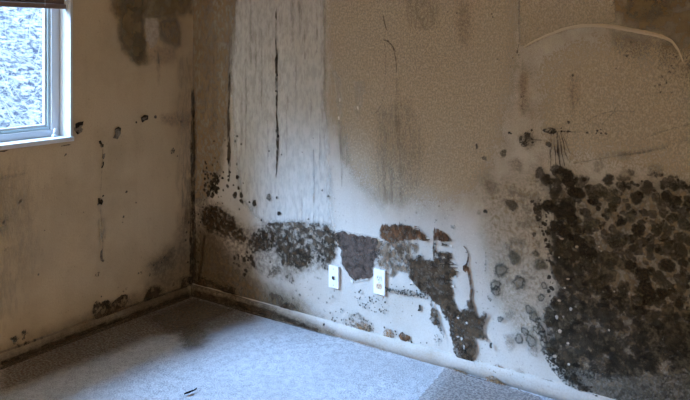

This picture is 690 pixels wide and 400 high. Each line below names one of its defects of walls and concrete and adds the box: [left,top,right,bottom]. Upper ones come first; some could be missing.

water stain [0,0,387,389]
peeling [334,222,487,361]
water stain [326,0,690,400]